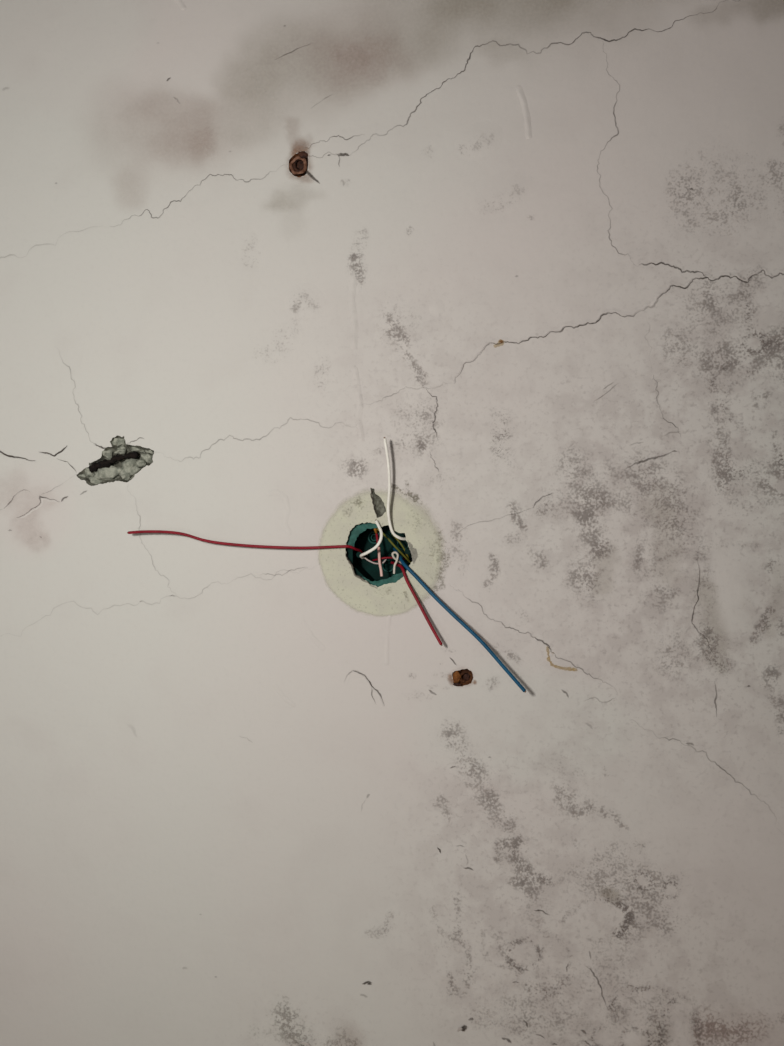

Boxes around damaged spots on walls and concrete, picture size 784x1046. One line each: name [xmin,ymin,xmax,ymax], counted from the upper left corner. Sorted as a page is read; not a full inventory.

crack [569,18,685,45]
crack [416,51,473,108]
crack [432,262,784,397]
crack [0,446,75,470]
spalling [77,435,154,486]
crack [345,672,383,707]
rust [451,671,475,686]